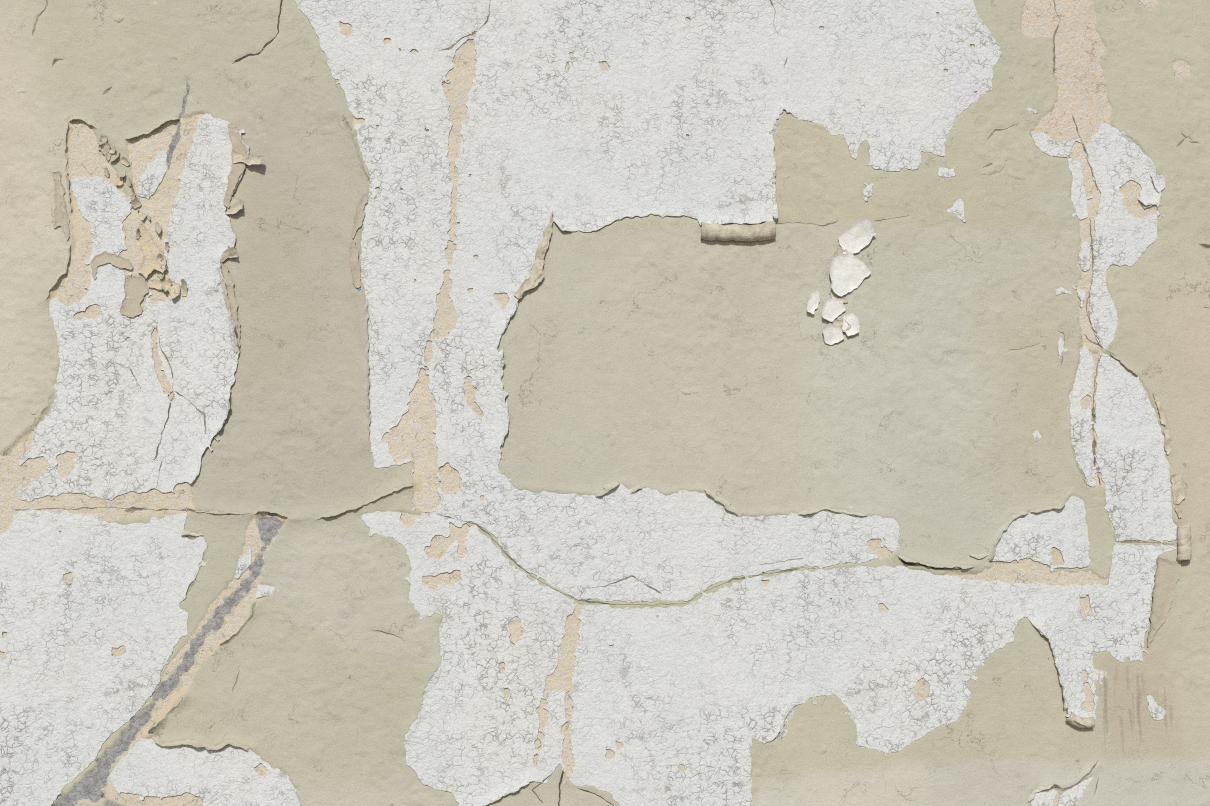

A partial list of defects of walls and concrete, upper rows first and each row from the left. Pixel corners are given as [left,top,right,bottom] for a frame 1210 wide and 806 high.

crack [234,0,283,63]
peeling [0,113,301,806]
crack [16,323,285,806]
crack [438,514,815,606]
peeling [295,0,1192,806]
crack [900,558,962,570]